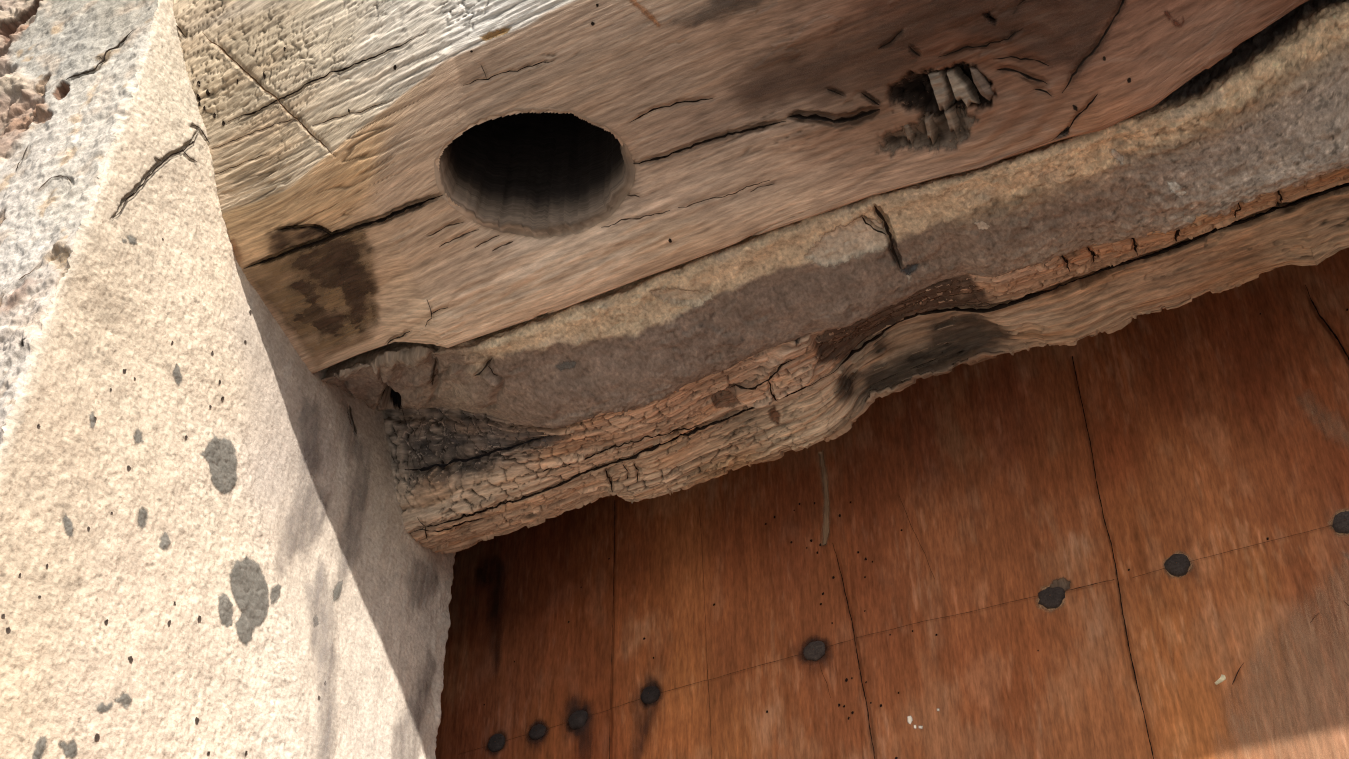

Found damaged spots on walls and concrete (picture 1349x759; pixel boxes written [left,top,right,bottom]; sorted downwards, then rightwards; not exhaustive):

crack [66,30,133,80]
crack [113,25,426,218]
spalling [880,63,995,156]
leakage [251,231,377,356]
leakage [817,274,1010,399]
leakage [201,436,237,494]
leakage [218,556,281,645]
leakage [313,555,348,757]